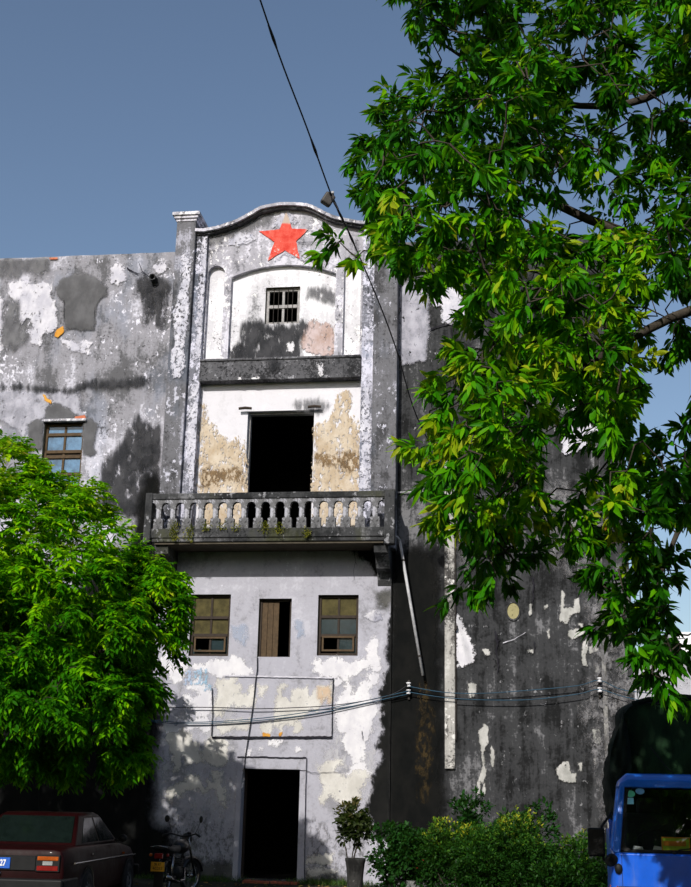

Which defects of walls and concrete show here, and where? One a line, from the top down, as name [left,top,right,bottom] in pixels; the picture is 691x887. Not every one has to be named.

peeling [0,278,93,355]
water stain [136,274,170,329]
peeling [170,237,207,378]
water stain [229,319,308,373]
water stain [99,414,161,560]
peeling [185,383,249,527]
peeling [310,386,372,492]
water stain [0,683,234,881]
peeling [160,636,382,810]
rust [415,683,436,804]
peeling [456,615,490,668]
water stain [585,603,634,784]